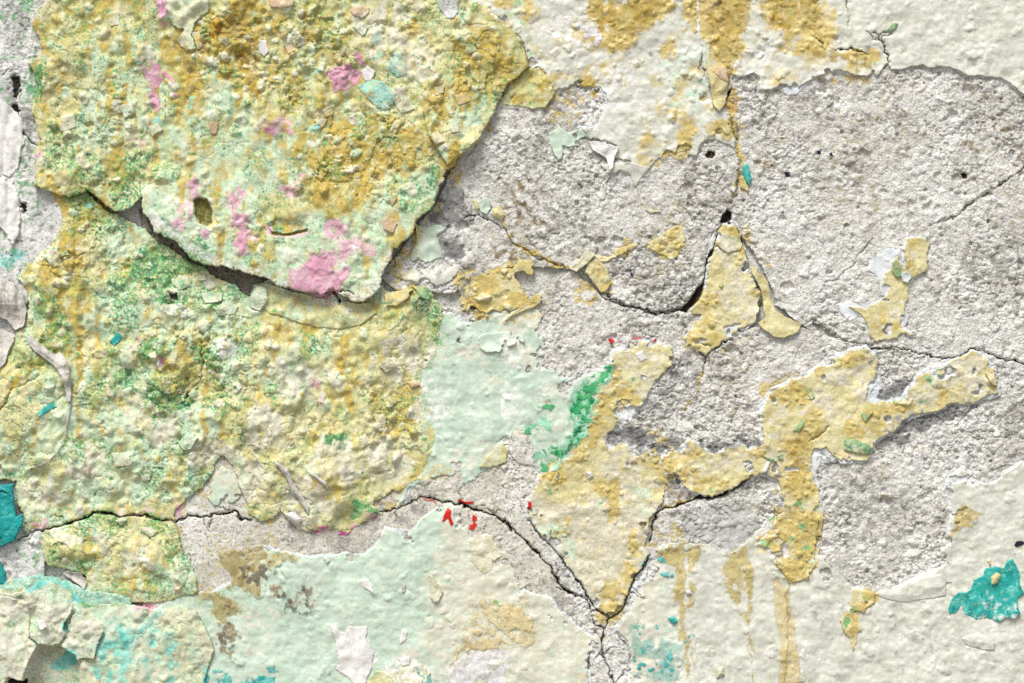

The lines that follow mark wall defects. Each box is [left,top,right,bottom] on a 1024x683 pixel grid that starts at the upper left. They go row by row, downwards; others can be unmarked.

crack [730,117,741,197]
crack [930,167,1024,226]
peeling [0,0,444,605]
crack [504,228,563,267]
crack [602,223,762,315]
spalling [382,0,1024,592]
crack [882,347,1024,376]
peeling [0,270,701,683]
crack [0,507,250,544]
crack [385,480,747,682]